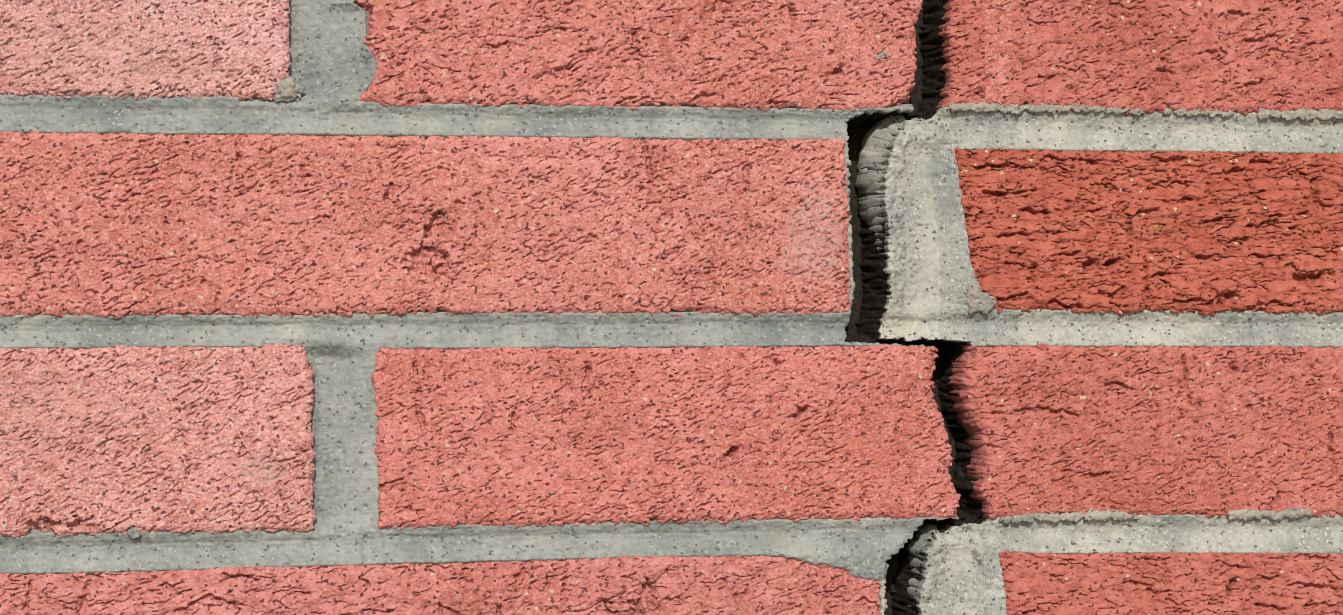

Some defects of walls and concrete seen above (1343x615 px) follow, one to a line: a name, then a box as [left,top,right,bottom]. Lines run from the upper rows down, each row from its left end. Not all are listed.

crack [847,0,953,176]
crack [845,166,989,615]